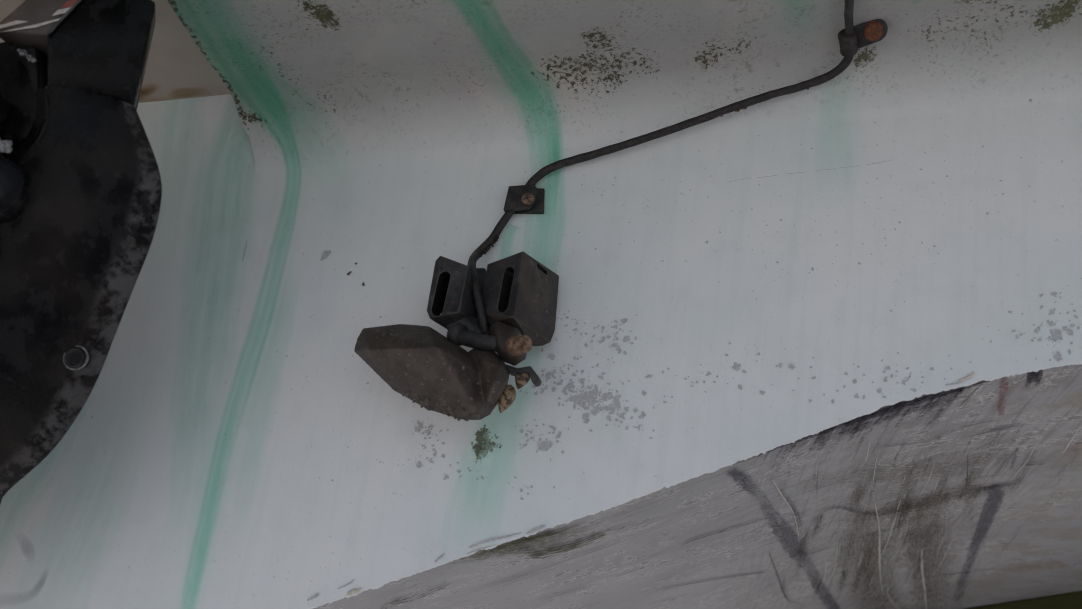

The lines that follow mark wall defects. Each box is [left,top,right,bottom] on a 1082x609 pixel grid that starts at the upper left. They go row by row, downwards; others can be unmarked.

water stain [298,0,340,31]
water stain [922,0,1082,48]
water stain [531,27,660,96]
water stain [695,35,757,69]